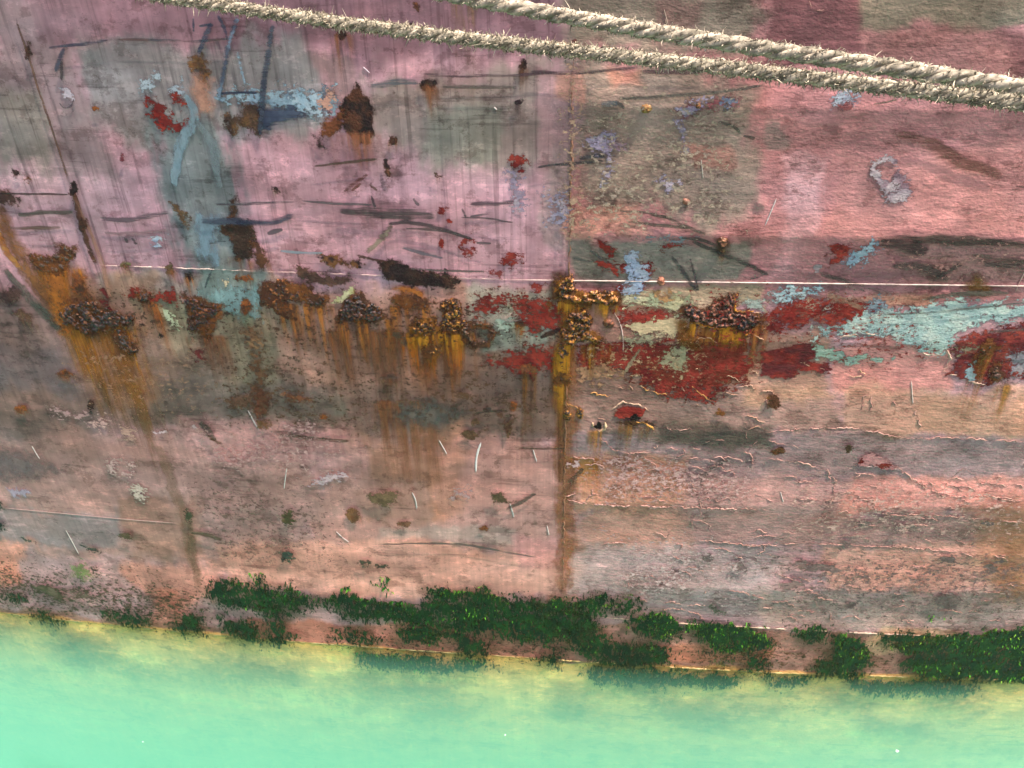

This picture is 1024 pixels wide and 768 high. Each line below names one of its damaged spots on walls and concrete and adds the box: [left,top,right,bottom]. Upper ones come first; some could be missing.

corrosion [0,24,151,432]
corrosion [162,195,500,430]
corrosion [312,82,375,154]
corrosion [460,418,480,440]
peeling [0,68,1024,643]
corrosion [540,272,623,587]
corrosion [678,292,767,364]
spalling [313,621,578,664]